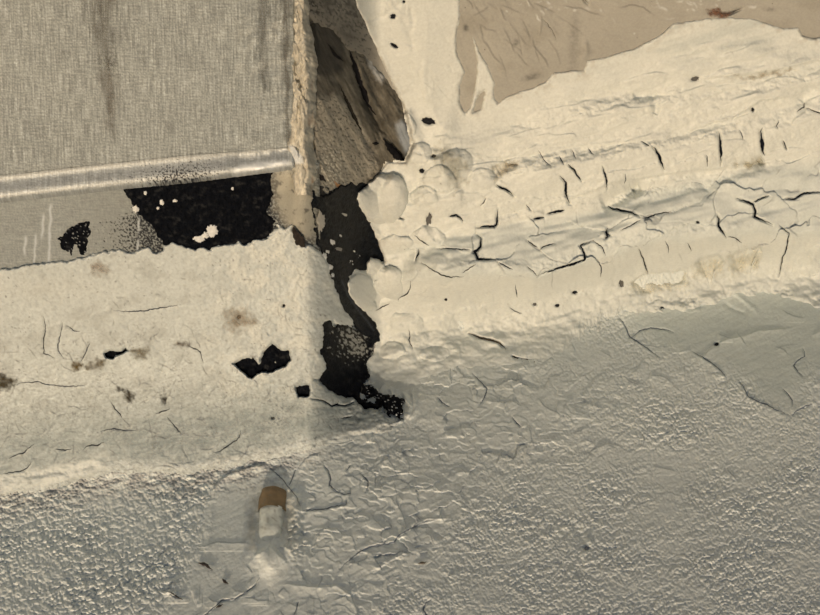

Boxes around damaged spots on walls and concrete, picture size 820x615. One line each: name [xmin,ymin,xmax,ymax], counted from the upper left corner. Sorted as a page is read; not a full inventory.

crack [706,131,723,166]
crack [740,121,786,156]
peeling [57,221,91,256]
peeling [124,172,275,250]
crack [416,149,669,313]
crack [737,192,820,274]
peeling [311,182,405,420]
crack [43,319,90,359]
peeling [234,344,291,378]
peeling [296,385,310,397]
crack [56,405,135,451]
crack [271,466,369,511]